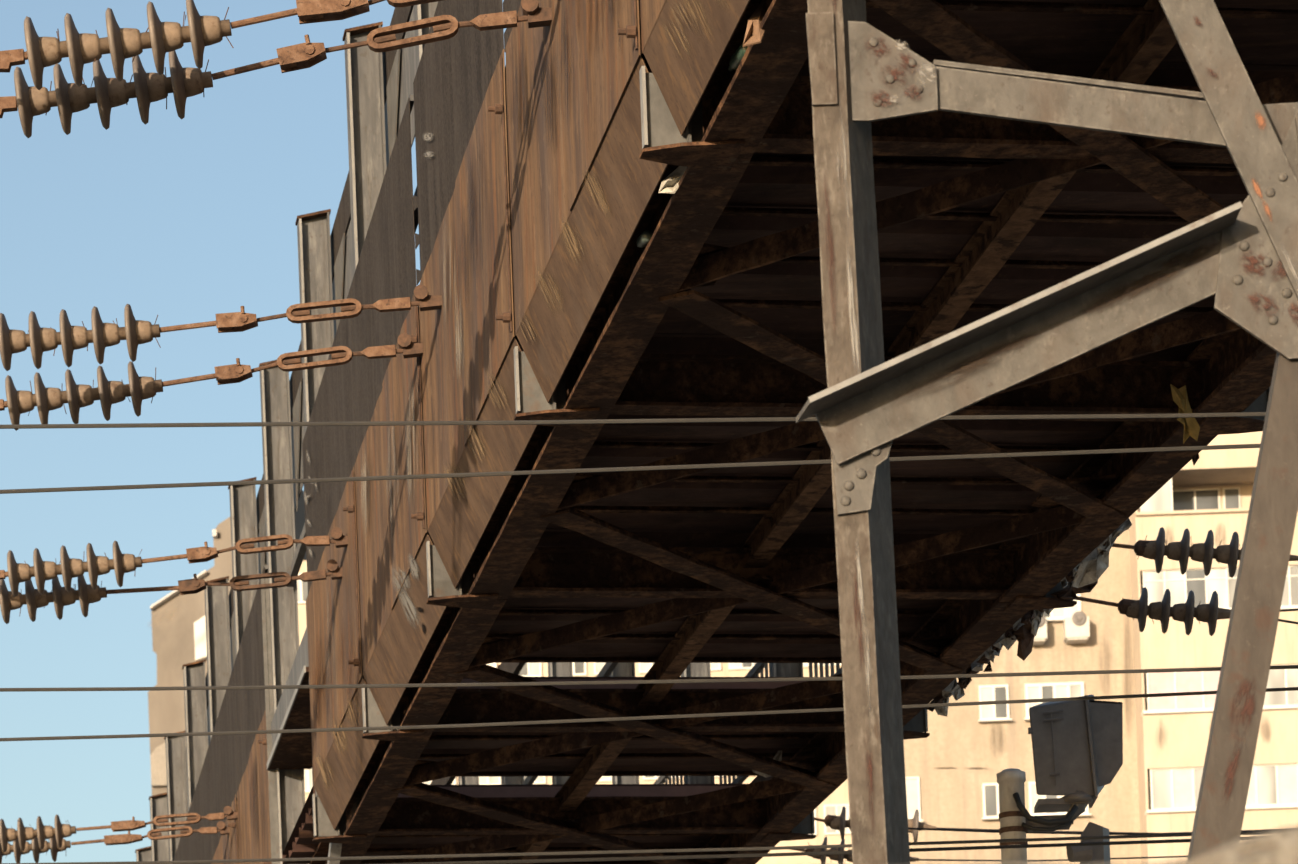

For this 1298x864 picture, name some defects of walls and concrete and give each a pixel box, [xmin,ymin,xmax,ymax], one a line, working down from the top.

corrosion [869,40,919,105]
corrosion [1243,255,1286,279]
corrosion [1249,293,1298,323]
peeling [926,518,1132,717]